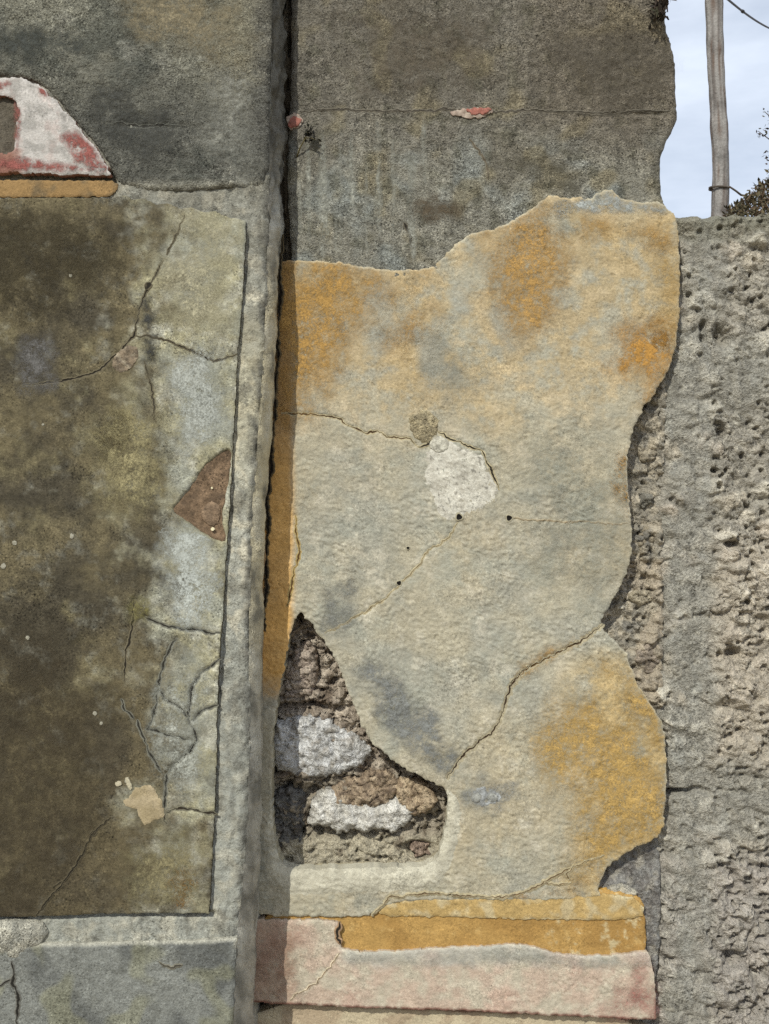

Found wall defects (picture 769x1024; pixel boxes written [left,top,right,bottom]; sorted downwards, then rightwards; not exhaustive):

crack [300,106,671,117]
crack [20,215,237,423]
crack [263,235,500,634]
spalling [424,436,498,520]
crack [120,599,221,824]
spalling [263,612,462,896]
crack [445,623,605,780]